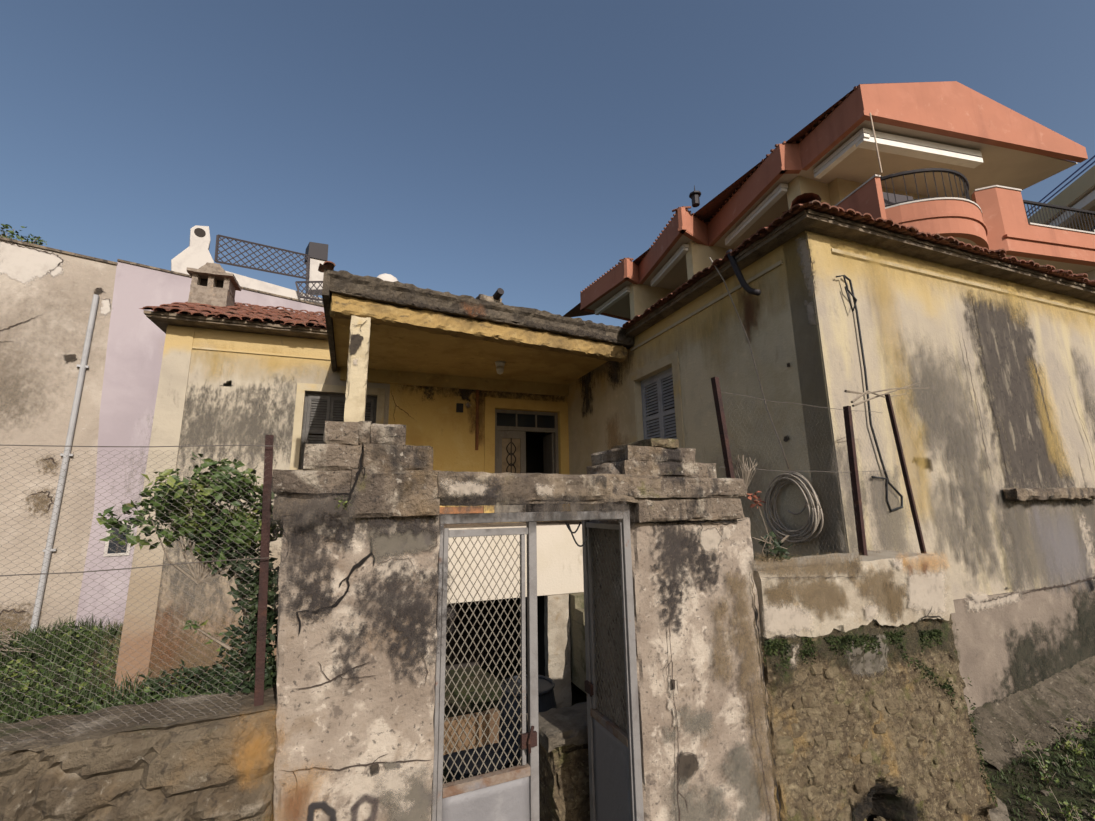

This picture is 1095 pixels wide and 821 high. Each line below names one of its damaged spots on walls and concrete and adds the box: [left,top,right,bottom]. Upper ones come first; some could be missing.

spalling [0,240,63,277]
water stain [580,349,631,417]
water stain [180,380,297,464]
spalling [22,488,55,515]
water stain [897,291,1095,702]
crack [296,531,375,636]
peeling [893,558,946,615]
water stain [651,448,907,821]
peeling [763,605,812,667]
spalling [845,635,889,675]
crack [283,754,430,794]
spalling [852,781,924,821]